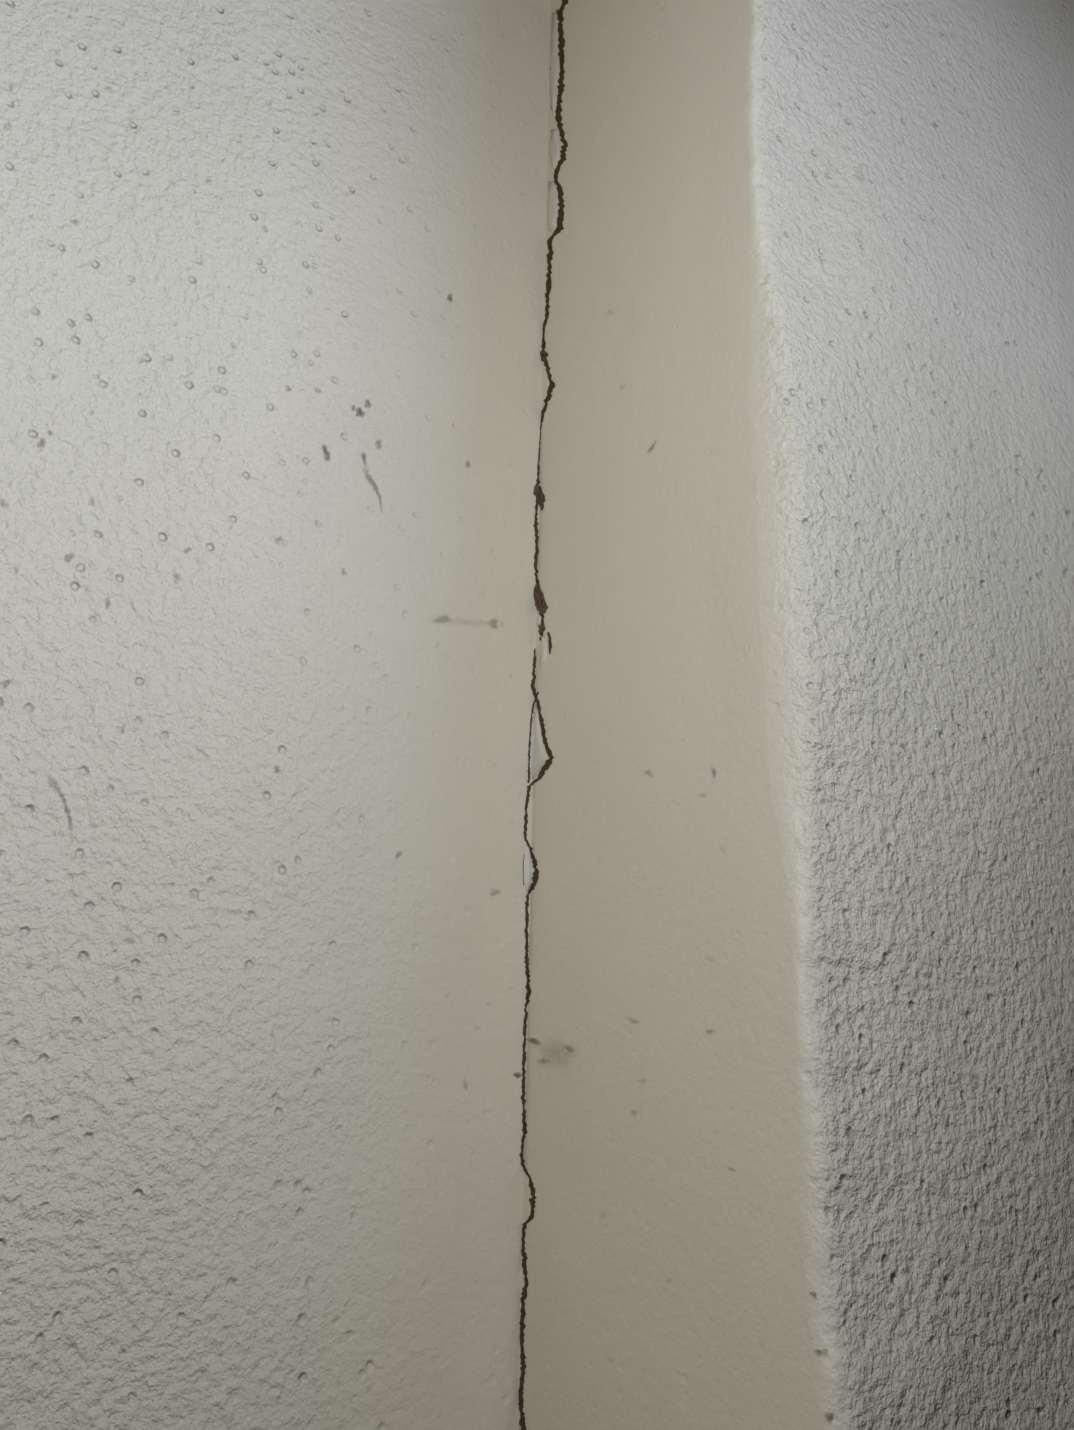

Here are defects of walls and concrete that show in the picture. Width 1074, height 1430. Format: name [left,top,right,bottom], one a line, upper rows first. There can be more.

crack [514,0,568,1430]